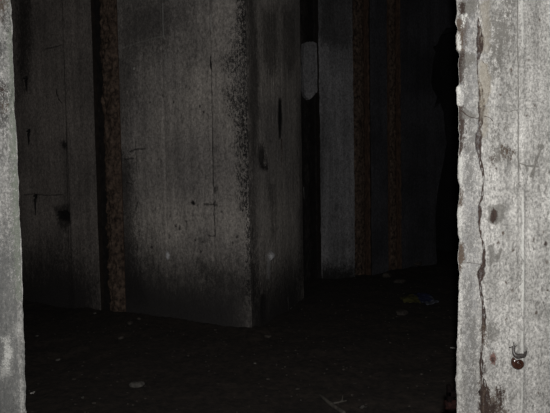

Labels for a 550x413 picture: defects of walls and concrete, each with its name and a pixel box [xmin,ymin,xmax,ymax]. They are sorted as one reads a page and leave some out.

spalling [456,0,480,157]
crack [461,18,493,413]